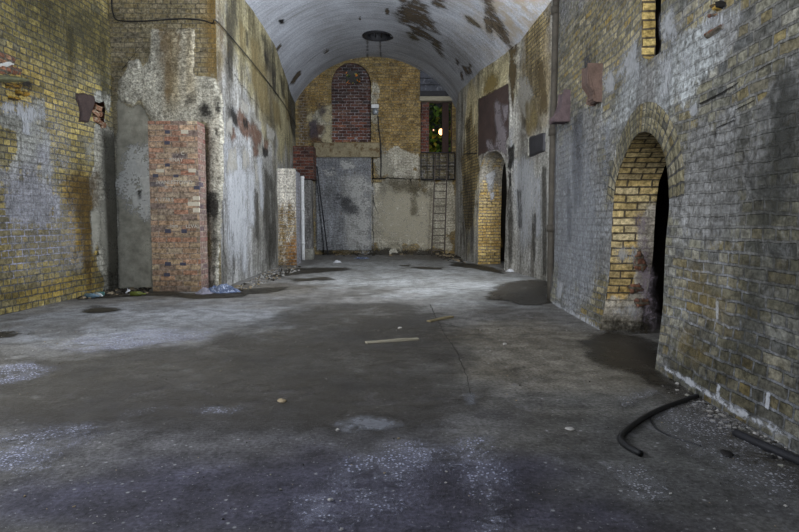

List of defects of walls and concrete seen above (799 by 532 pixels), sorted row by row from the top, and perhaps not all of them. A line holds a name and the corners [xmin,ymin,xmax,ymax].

leakage [3,102,98,284]
flaking render [117,28,274,288]
leakage [207,146,276,274]
leakage [486,154,799,494]